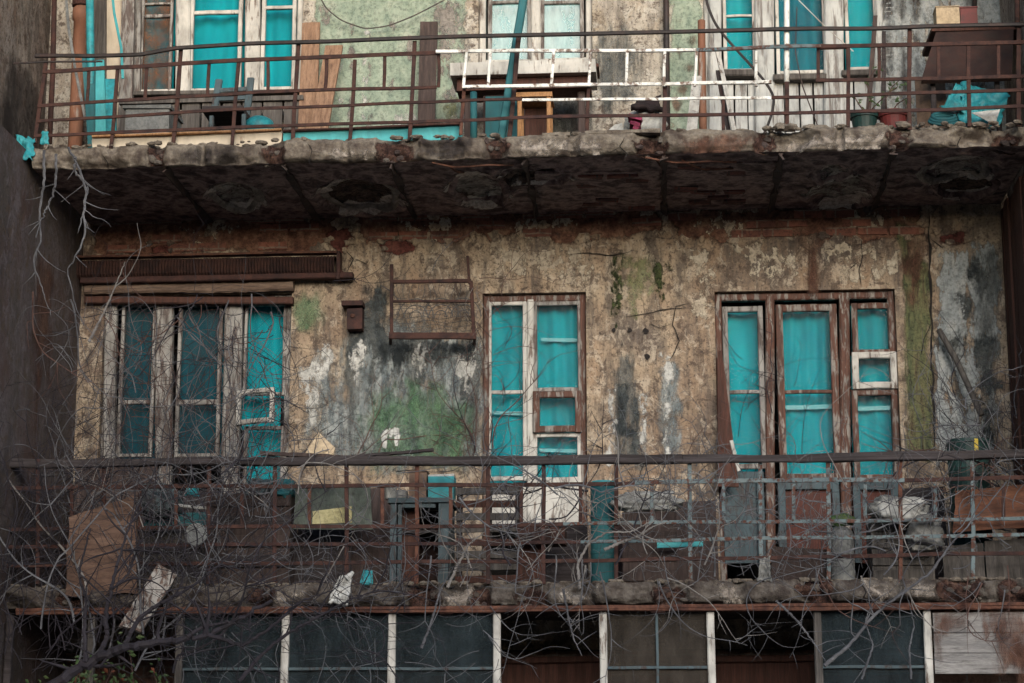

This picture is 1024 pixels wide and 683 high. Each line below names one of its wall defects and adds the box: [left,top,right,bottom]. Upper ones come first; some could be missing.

flaking render [89,139,940,328]
water stain [298,285,484,473]
water stain [606,344,647,469]
water stain [974,253,1002,447]